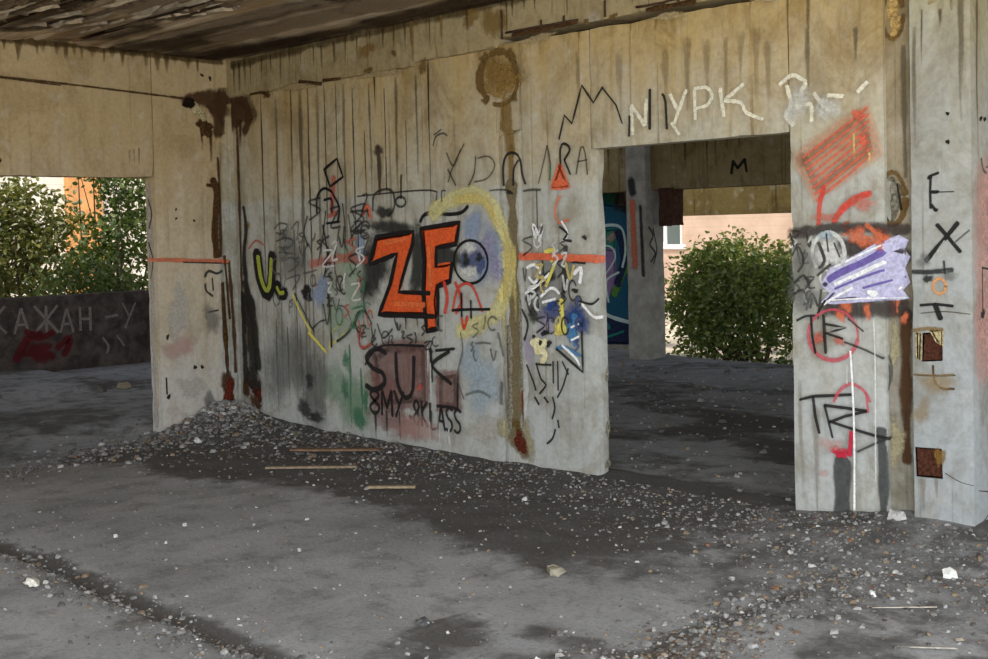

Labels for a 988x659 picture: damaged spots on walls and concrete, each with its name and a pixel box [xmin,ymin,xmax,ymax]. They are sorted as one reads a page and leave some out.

peeling [0,0,246,34]
damp [0,0,535,81]
damp [368,77,407,169]
damp [415,64,430,155]
rust [500,99,515,181]
damp [290,90,371,321]
rust [205,372,263,409]
rust [890,313,955,479]